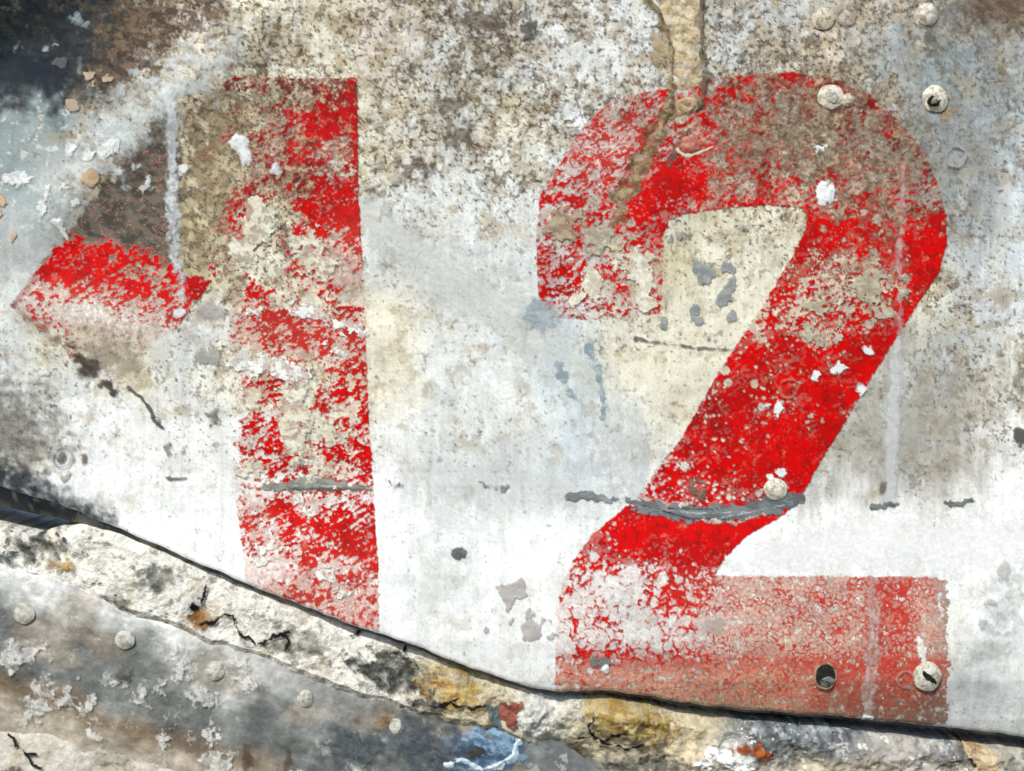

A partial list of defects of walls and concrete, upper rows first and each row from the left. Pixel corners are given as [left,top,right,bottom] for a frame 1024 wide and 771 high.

peeling [228,195,342,283]
peeling [692,258,737,322]
peeling [841,269,912,327]
peeling [287,297,369,360]
peeling [811,360,848,381]
peeling [226,345,349,523]
peeling [763,400,783,418]
peeling [756,468,787,498]
rust [187,602,210,629]
crack [199,585,290,652]
crack [7,733,42,770]
rust [729,742,774,761]